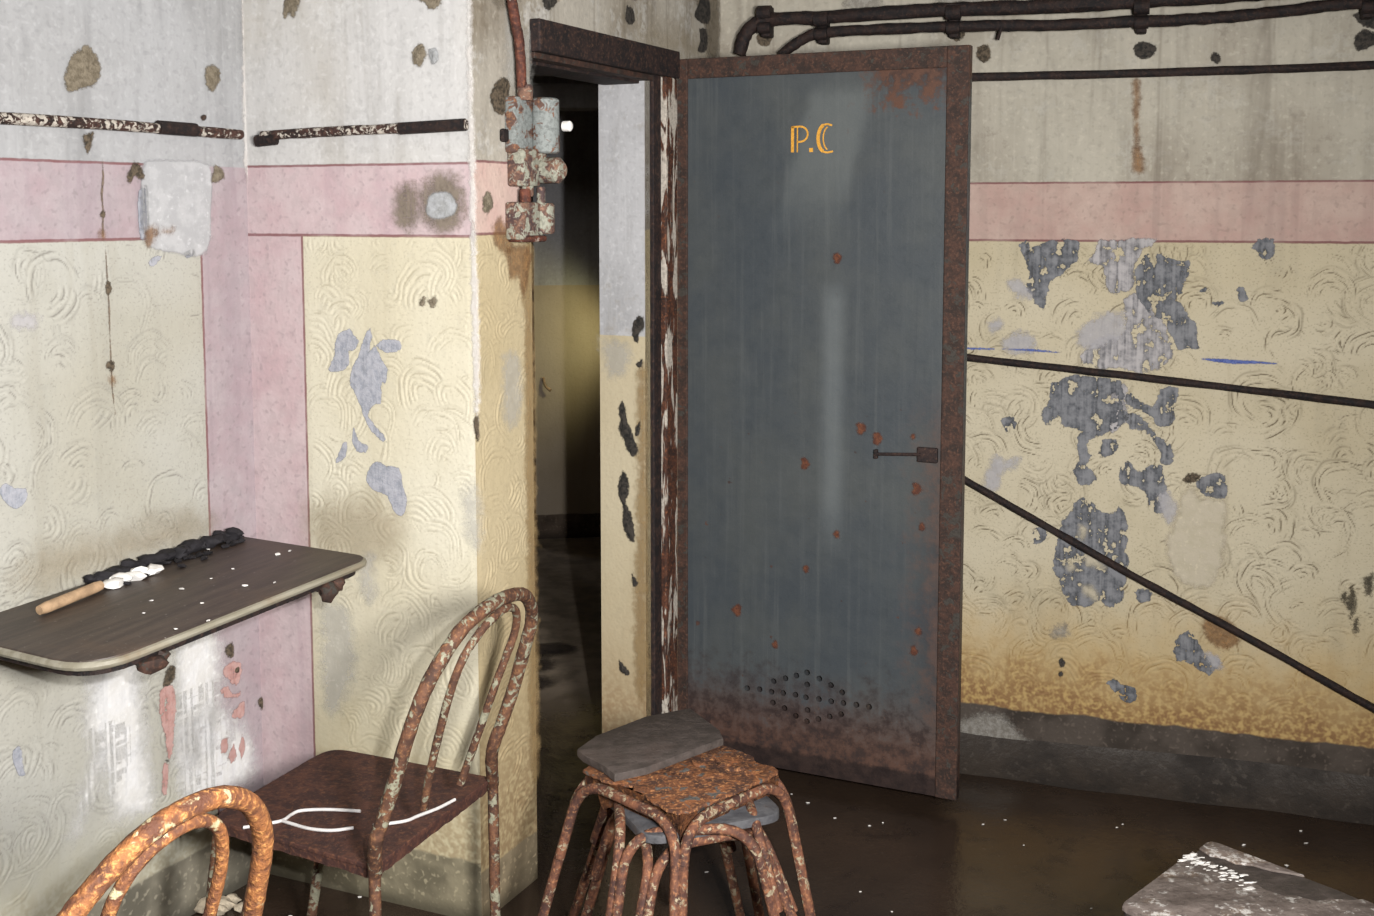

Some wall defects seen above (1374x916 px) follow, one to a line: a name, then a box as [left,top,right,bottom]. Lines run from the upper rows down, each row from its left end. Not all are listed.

spalling [64,45,101,92]
corrosion [490,78,510,115]
corrosion [529,52,654,81]
corrosion [1133,79,1144,172]
peeling [328,329,407,516]
spalling [618,401,640,457]
peeling [1008,237,1200,607]
spalling [618,472,635,542]
peeling [1183,473,1228,499]
leakage [84,665,153,818]
leakage [175,634,254,796]
leakage [960,714,1024,740]